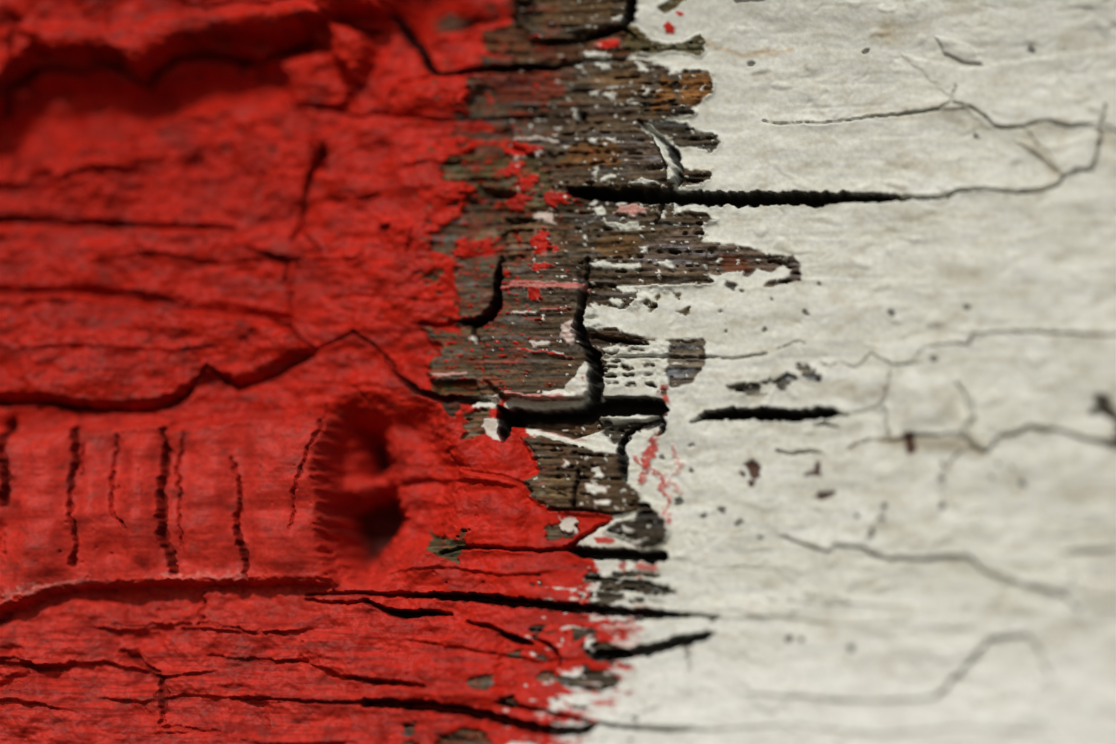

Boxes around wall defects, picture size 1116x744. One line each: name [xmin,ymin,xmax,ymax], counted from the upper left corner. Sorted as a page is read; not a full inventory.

crack [0,0,640,125]
crack [0,143,414,285]
peeling [416,0,802,440]
crack [566,83,1116,225]
crack [0,254,1116,580]
peeling [726,364,828,398]
peeling [426,529,468,566]
crack [230,675,708,738]
crack [305,590,723,674]
peeling [507,619,633,694]
peeling [523,420,668,551]
peeling [579,571,676,607]